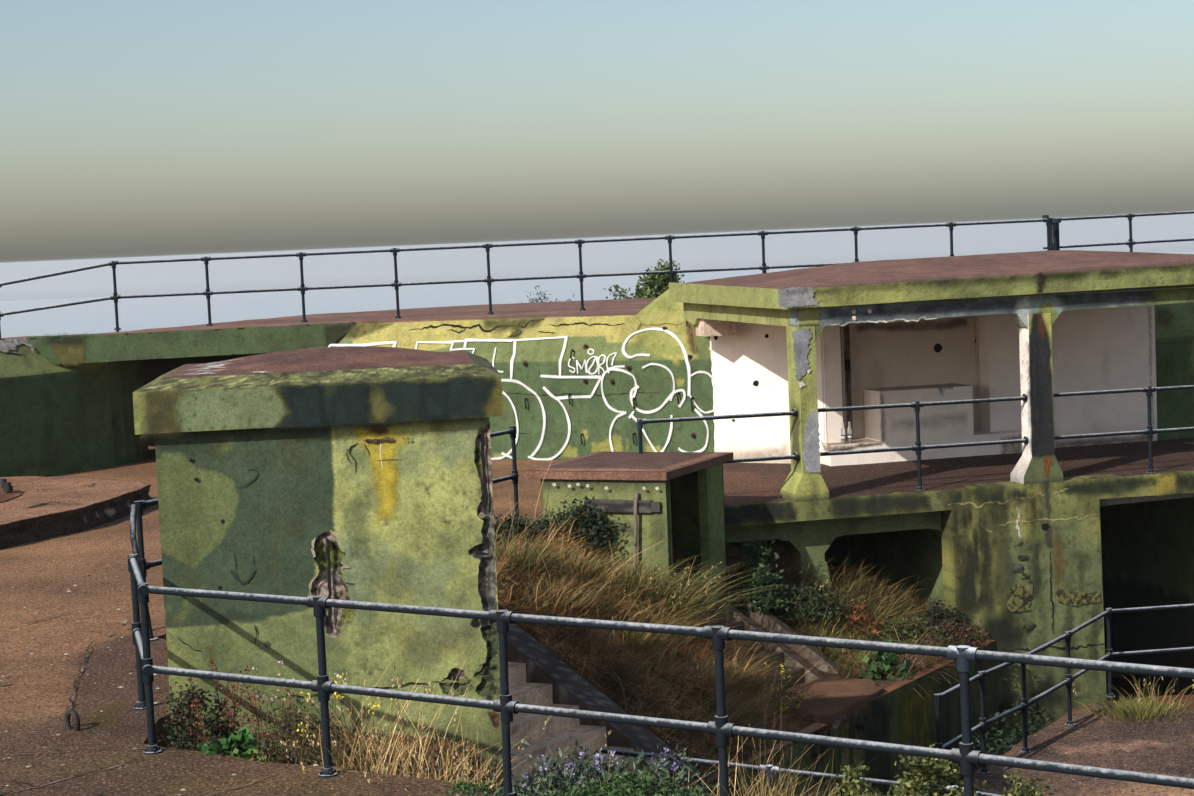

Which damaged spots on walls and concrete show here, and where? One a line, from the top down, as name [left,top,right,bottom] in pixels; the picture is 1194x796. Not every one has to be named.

crack [411,317,688,337]
peeling [792,328,812,387]
peeling [802,411,821,473]
crack [948,488,1099,533]
spalling [308,530,356,638]
spalling [439,422,500,729]
crack [1004,552,1105,651]